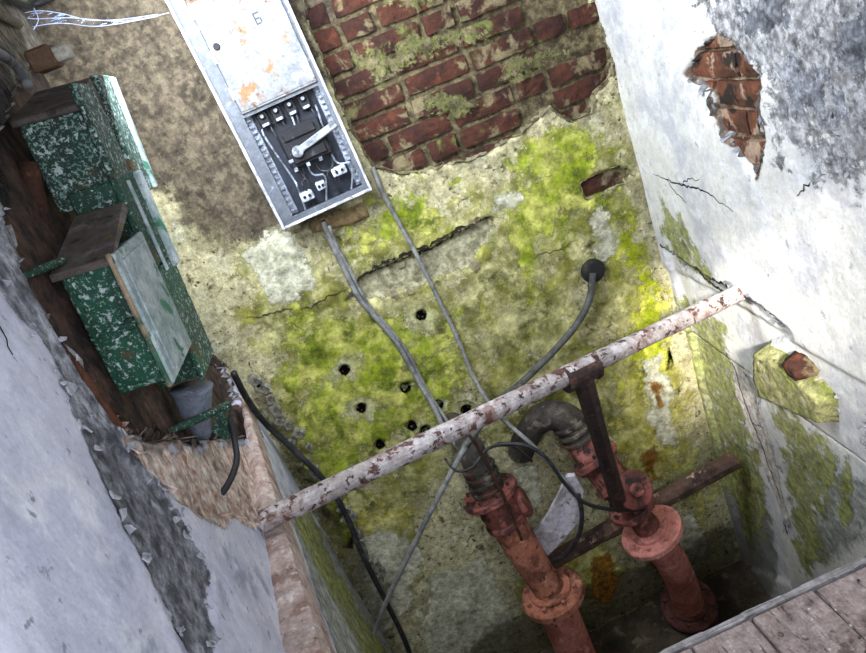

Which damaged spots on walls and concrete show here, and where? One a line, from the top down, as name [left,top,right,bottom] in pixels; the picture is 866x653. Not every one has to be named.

damp [733,0,790,38]
flaking render [303,0,614,175]
peeling [684,0,866,207]
damp [770,0,866,140]
damp [241,229,316,306]
damp [492,191,524,213]
damp [588,207,620,262]
peeling [0,202,261,653]
damp [639,353,679,450]
damp [513,465,544,517]
damp [679,513,709,562]
corrosion [590,552,619,604]